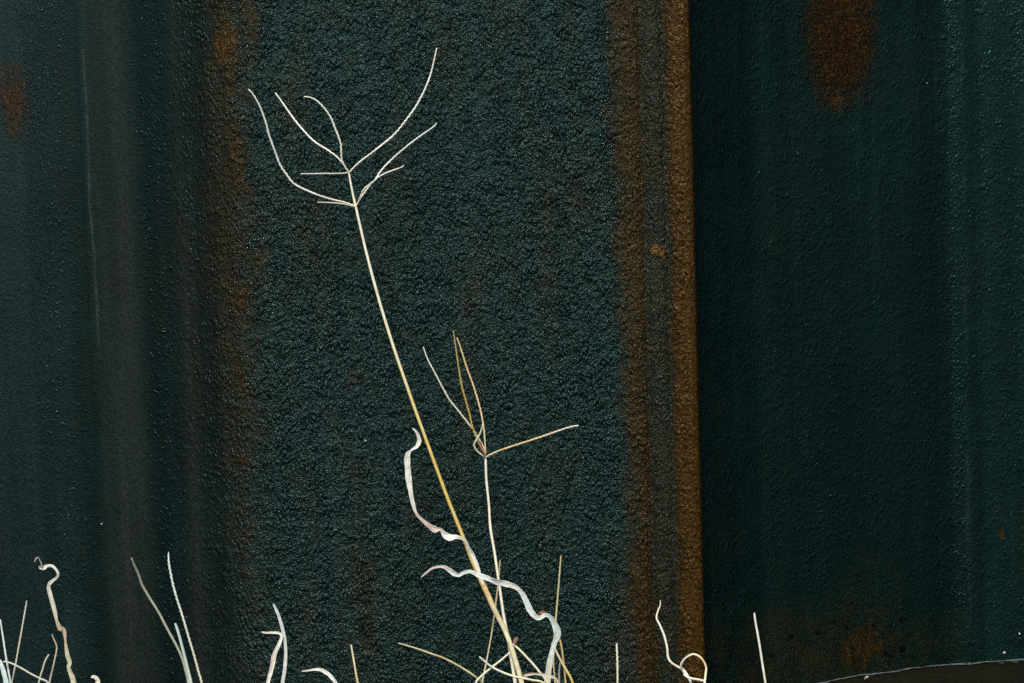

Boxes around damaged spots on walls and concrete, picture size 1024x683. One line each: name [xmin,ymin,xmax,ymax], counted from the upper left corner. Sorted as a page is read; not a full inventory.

corrosion [650,0,705,683]